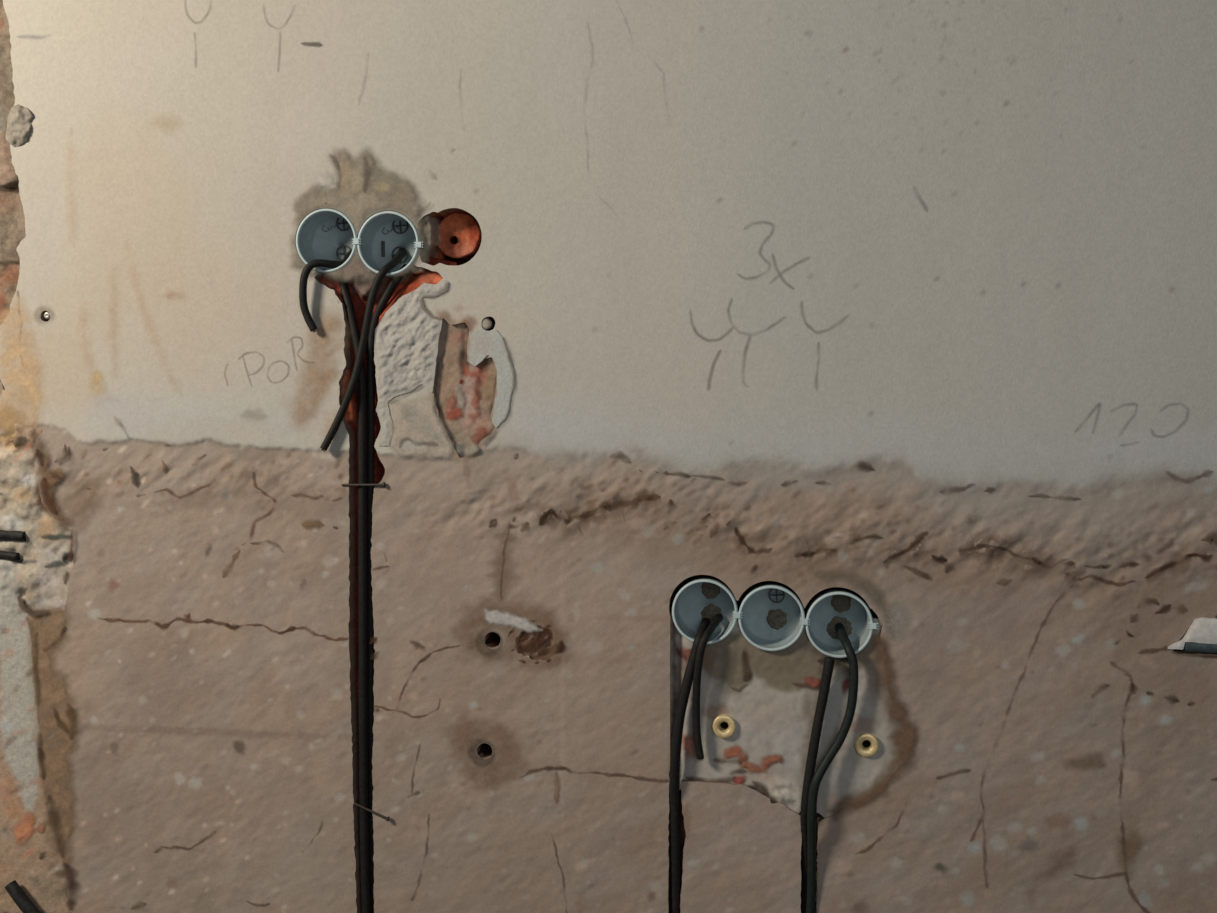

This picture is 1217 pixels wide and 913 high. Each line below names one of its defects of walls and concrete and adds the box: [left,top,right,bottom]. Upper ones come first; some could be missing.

spalling [0,0,33,325]
spalling [435,319,497,458]
flaking render [0,423,77,913]
crack [104,613,377,659]
crack [373,642,456,900]
crack [524,767,669,803]
crack [936,770,970,779]
crack [1074,662,1192,913]